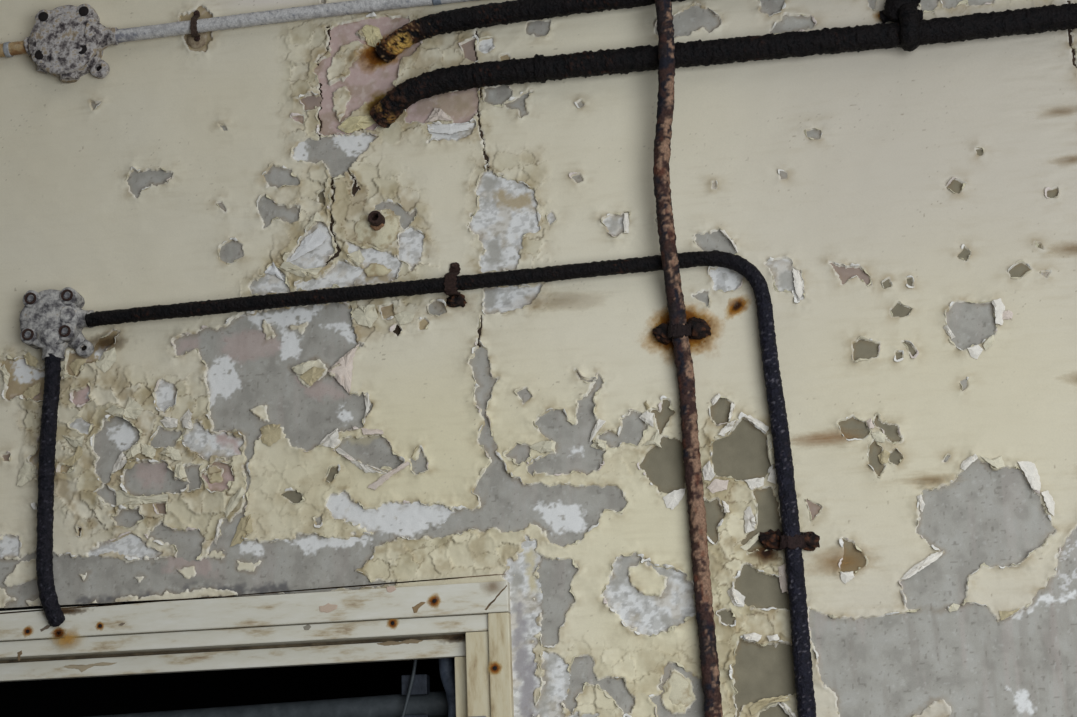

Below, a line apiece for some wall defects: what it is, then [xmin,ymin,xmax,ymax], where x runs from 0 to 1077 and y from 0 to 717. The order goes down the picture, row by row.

crack [316,26,331,140]
peeling [250,12,423,296]
rust [360,38,396,68]
peeling [405,85,532,140]
crack [477,89,489,171]
crack [1067,1,1077,68]
rust [685,307,716,351]
rust [728,298,747,316]
peeling [52,299,686,648]
peeling [702,393,796,717]
peeling [808,454,1077,717]
rust [53,628,77,646]